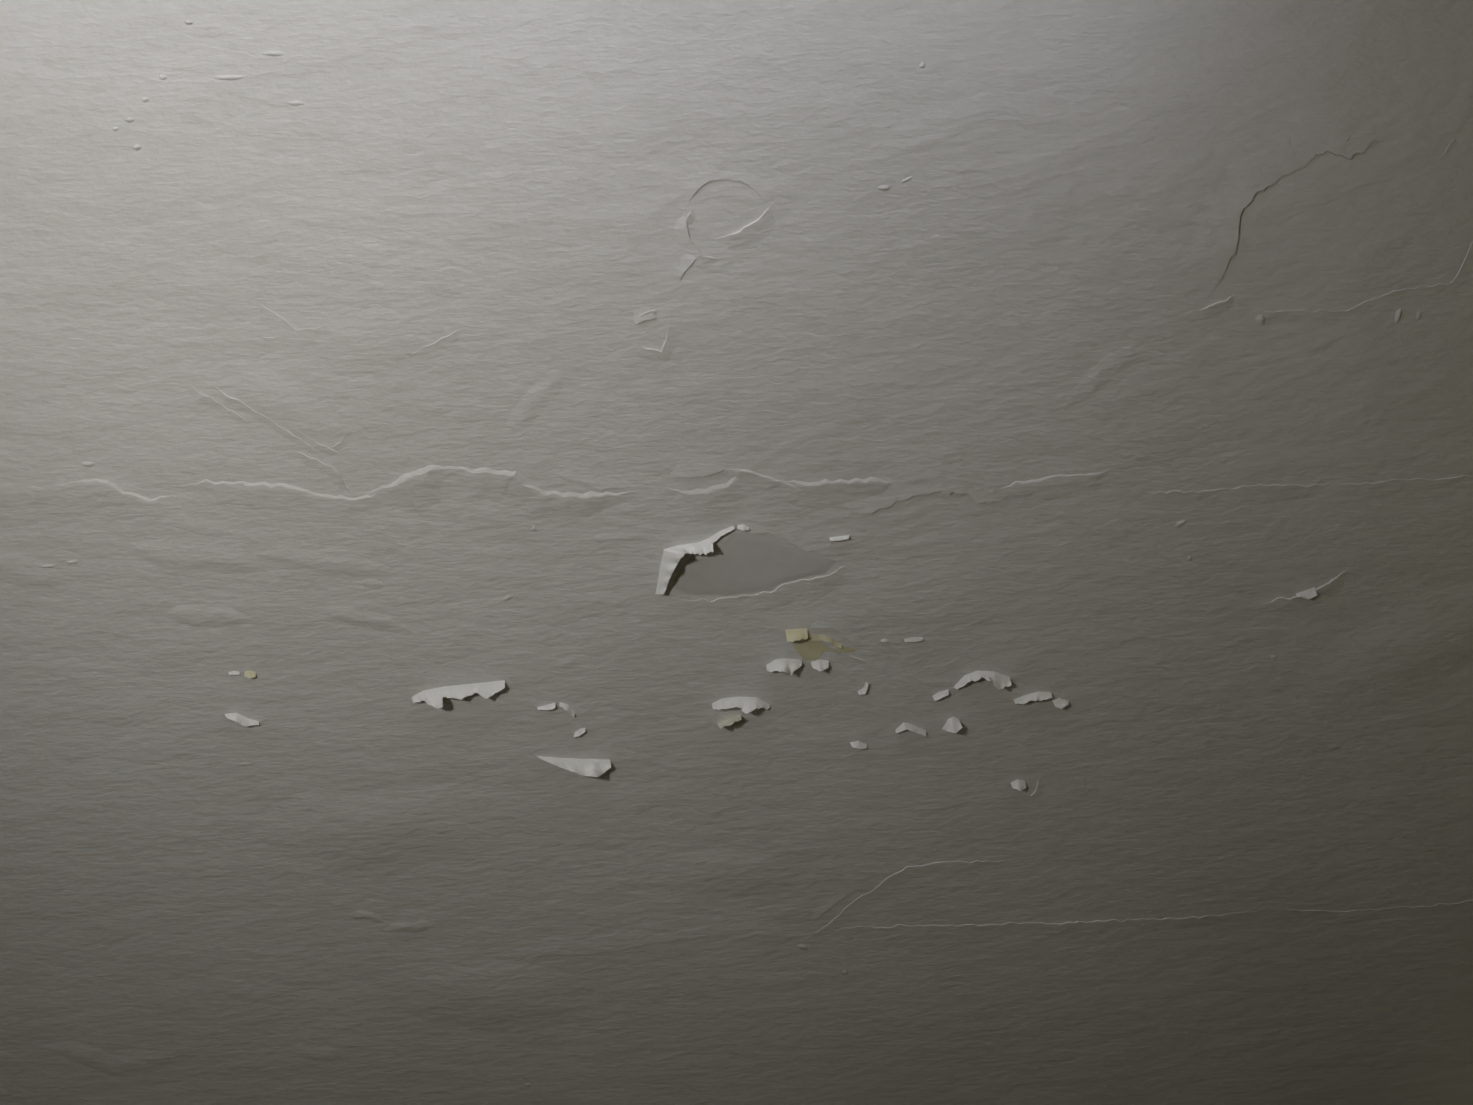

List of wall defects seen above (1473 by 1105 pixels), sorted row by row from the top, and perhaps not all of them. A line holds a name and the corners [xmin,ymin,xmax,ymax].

peeling [656,511,851,617]
peeling [1266,570,1348,613]
peeling [767,619,869,676]
peeling [412,680,505,709]
peeling [932,671,1069,709]
peeling [225,713,259,726]
peeling [537,702,585,737]
peeling [712,697,770,729]
peeling [895,717,962,736]
peeling [537,756,611,777]